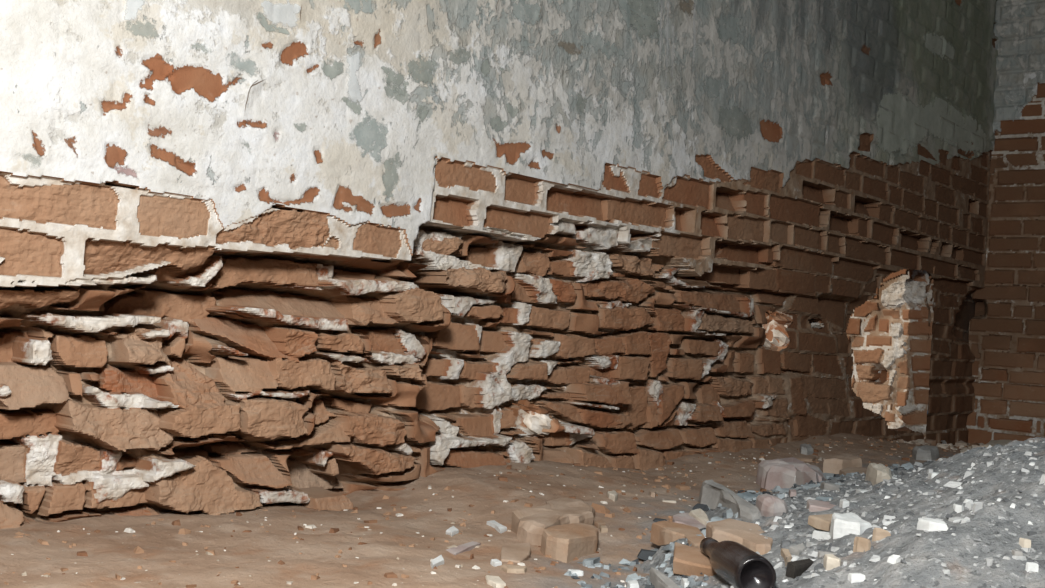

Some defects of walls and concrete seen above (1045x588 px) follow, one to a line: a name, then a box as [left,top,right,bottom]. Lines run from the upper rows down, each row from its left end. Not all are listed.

peeling [124,0,158,38]
peeling [101,52,256,115]
peeling [257,0,308,66]
peeling [381,55,436,123]
peeling [449,48,470,65]
peeling [820,72,833,86]
spalling [0,82,1045,529]